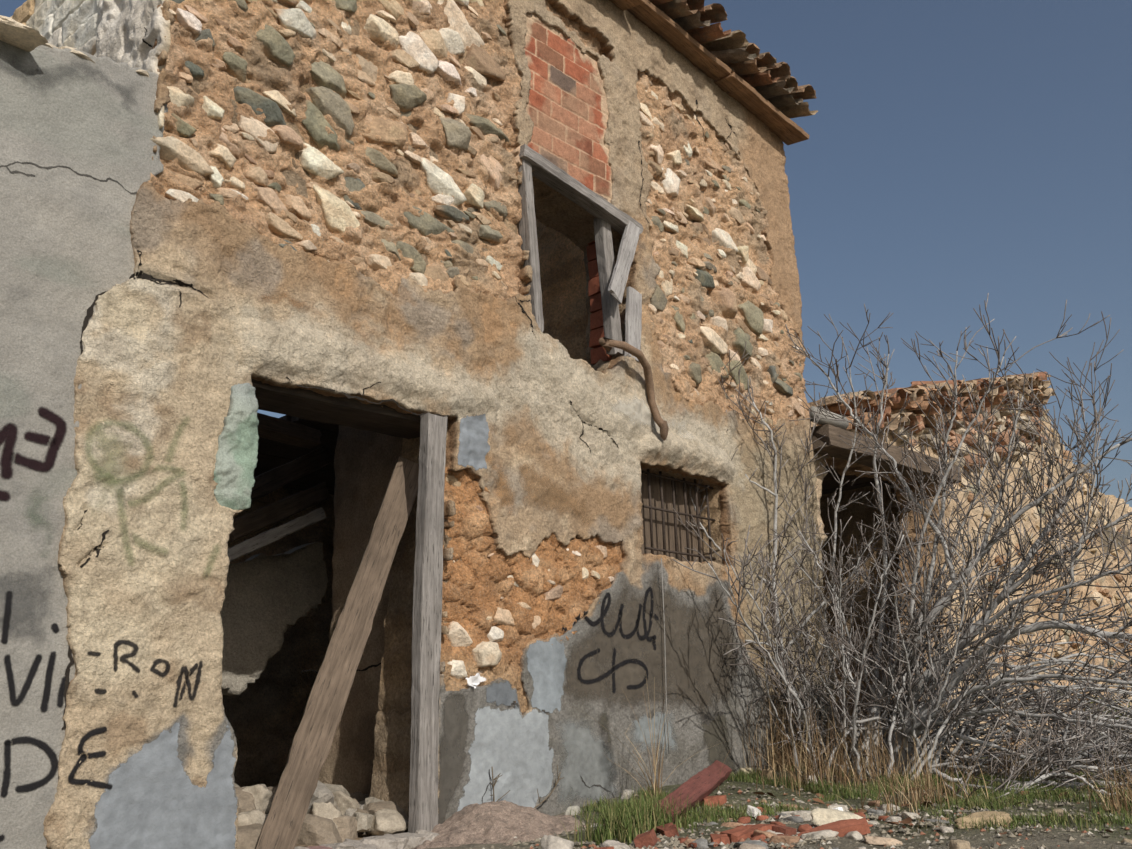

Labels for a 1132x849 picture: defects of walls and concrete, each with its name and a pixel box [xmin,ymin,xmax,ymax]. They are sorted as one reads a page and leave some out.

crack [0,161,137,194]
spalling [149,0,527,300]
crack [80,247,207,355]
spalling [636,72,810,436]
peeling [213,383,259,510]
crack [570,401,618,455]
spalling [440,414,623,812]
peeling [89,722,238,849]
peeling [634,713,675,750]